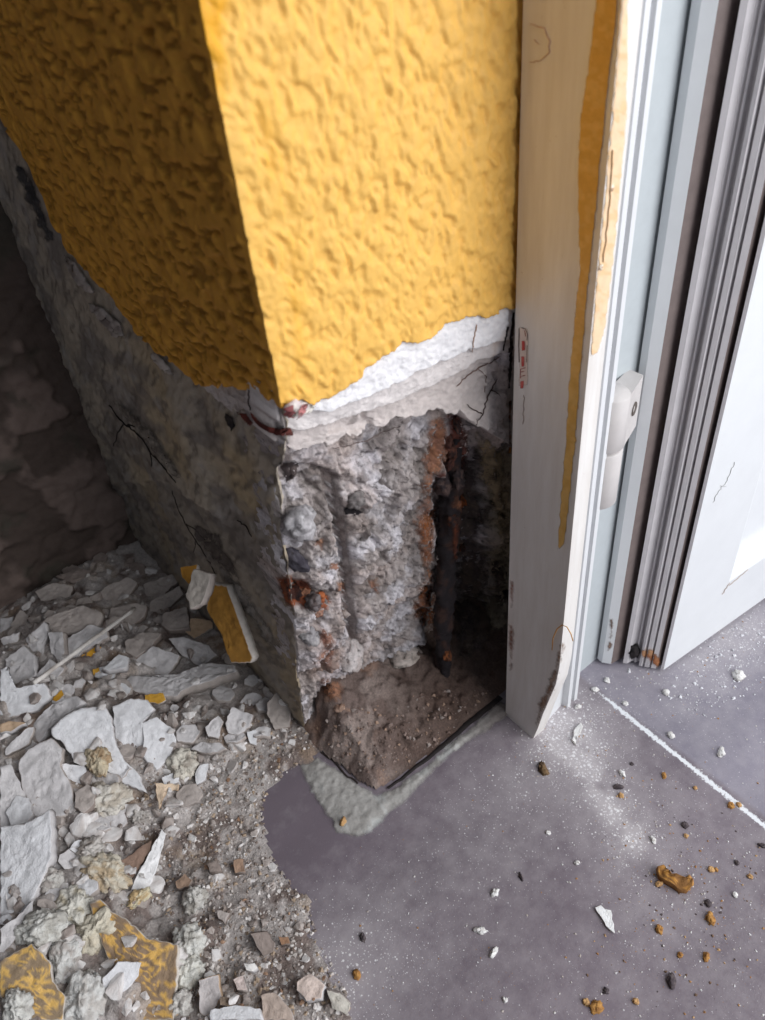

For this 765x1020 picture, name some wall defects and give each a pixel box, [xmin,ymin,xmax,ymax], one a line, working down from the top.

crack [457,312,525,426]
crack [108,405,216,574]
rust [276,577,331,618]
spalling [204,308,516,726]
rust [415,415,469,627]